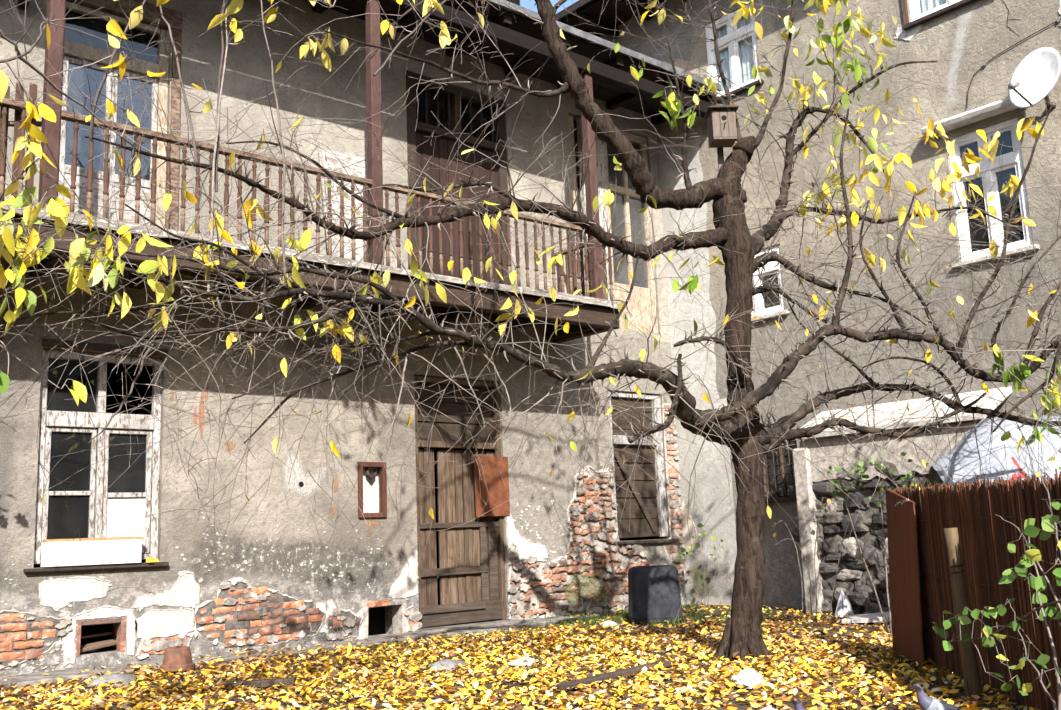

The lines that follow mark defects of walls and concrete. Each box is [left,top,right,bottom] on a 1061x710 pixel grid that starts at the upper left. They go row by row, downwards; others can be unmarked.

flaking render [0,512,422,674]
flaking render [507,465,652,620]
flaking render [662,403,701,596]